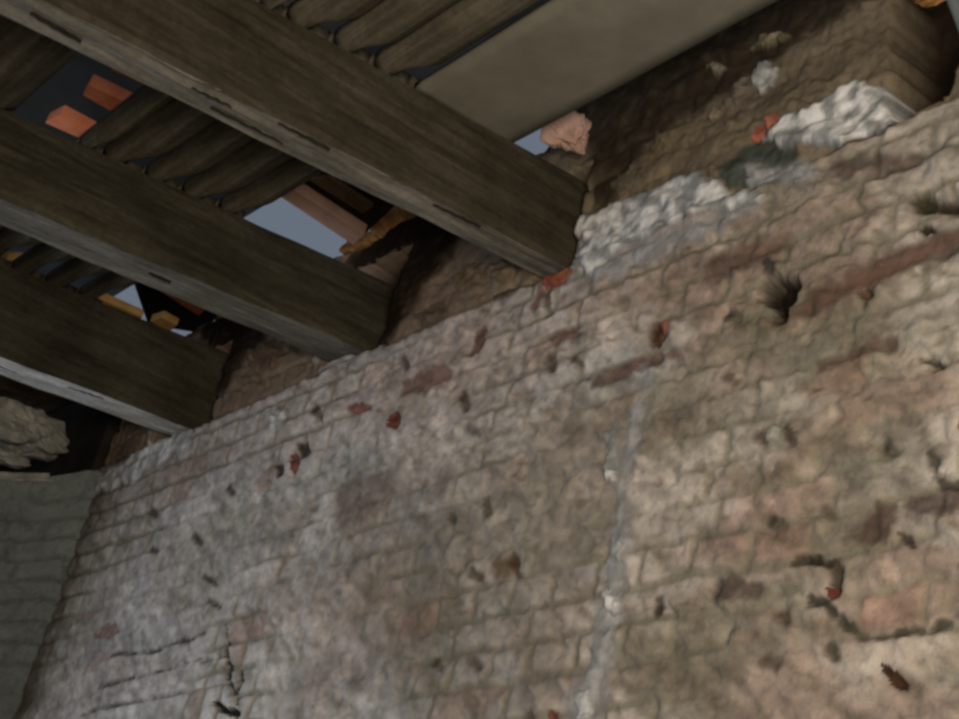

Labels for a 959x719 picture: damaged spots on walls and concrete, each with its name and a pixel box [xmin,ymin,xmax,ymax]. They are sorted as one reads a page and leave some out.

crack [84,634,244,718]